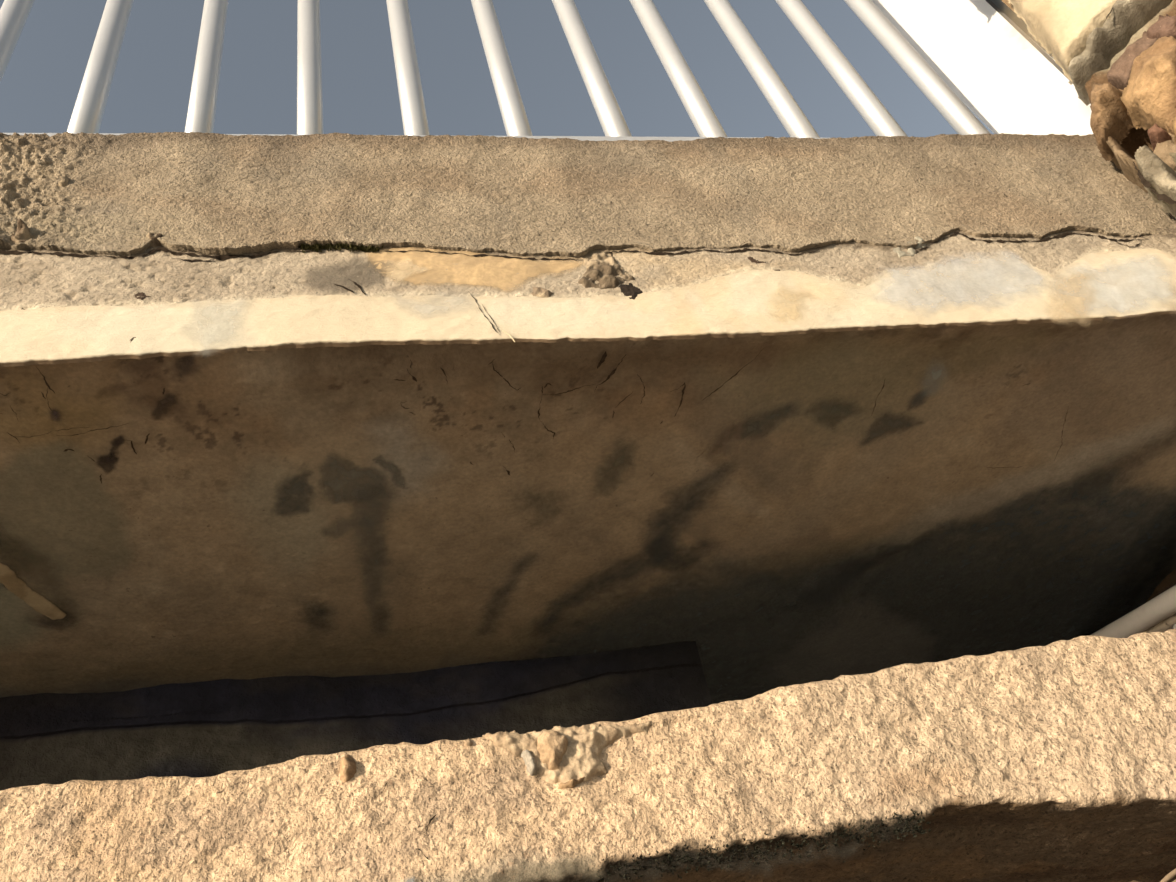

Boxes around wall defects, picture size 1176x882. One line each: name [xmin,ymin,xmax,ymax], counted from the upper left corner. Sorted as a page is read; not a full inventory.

crack [913,231,1147,251]
crack [0,247,309,262]
crack [385,248,823,260]
leakage [863,370,942,445]
leakage [277,456,404,631]